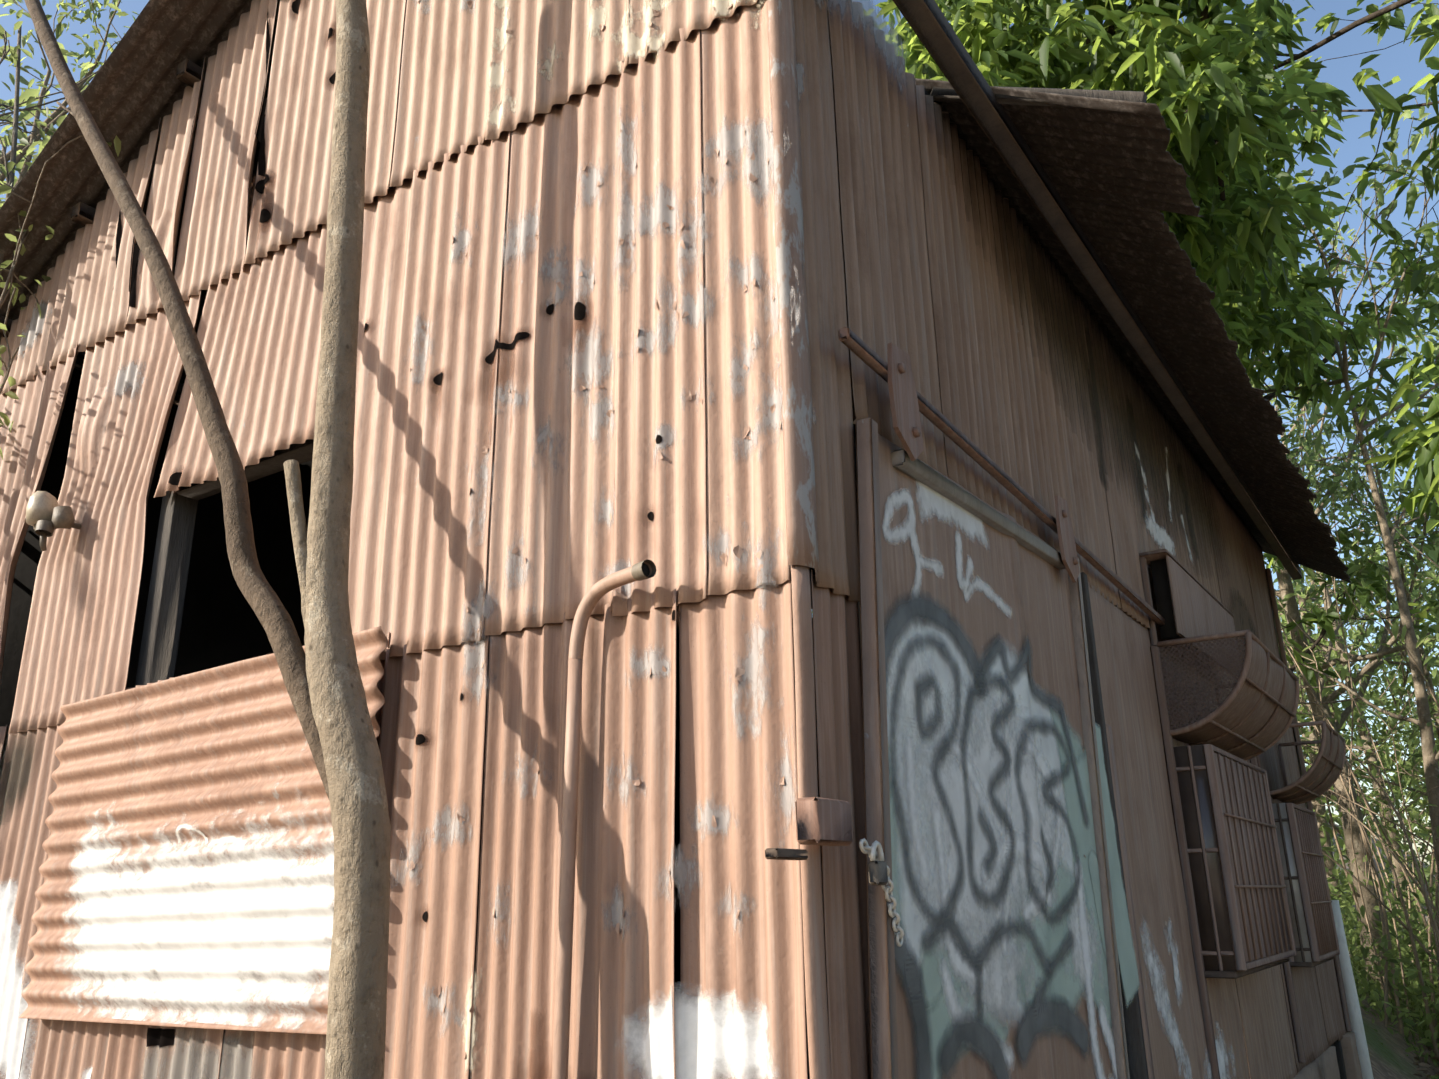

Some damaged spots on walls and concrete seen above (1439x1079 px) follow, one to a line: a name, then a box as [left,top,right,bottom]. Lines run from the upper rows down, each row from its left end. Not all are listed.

peeling [486,0,517,129]
peeling [587,0,672,70]
peeling [710,0,763,29]
water stain [0,740,33,827]